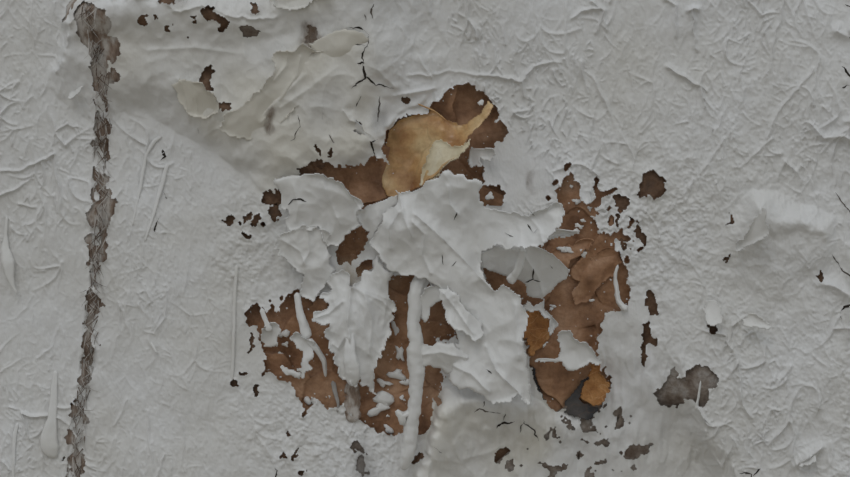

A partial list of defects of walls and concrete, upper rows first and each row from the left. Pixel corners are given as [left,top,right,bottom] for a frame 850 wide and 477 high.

peeling [137,14,158,26]
peeling [190,5,230,32]
peeling [239,25,261,38]
peeling [304,25,318,44]
peeling [199,65,215,91]
crack [350,4,394,155]
crack [62,0,121,477]
peeling [221,82,667,472]
peeling [653,364,719,410]
peeling [350,440,370,477]
peeling [538,462,568,477]
peeling [584,443,654,477]